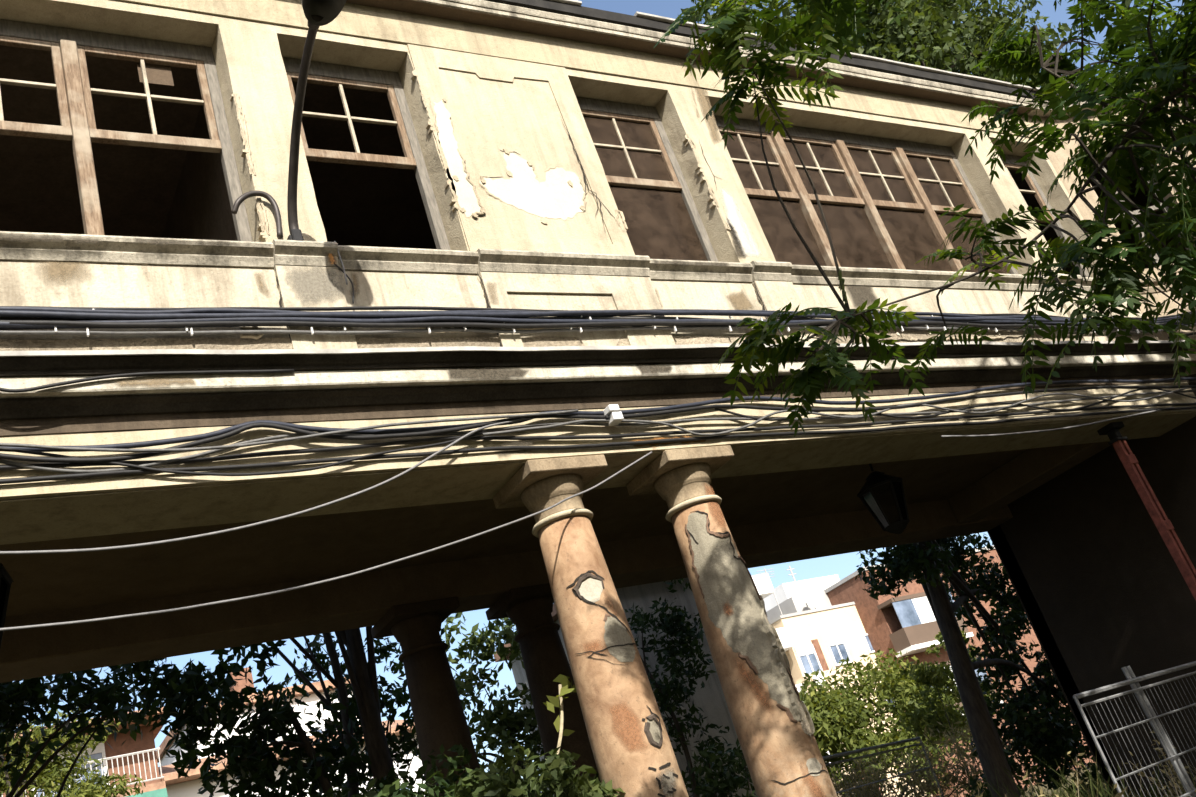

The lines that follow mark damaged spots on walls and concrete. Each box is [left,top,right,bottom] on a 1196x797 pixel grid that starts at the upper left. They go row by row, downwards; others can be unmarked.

peeling [410,69,587,224]
peeling [566,570,636,662]
peeling [685,510,815,741]
peeling [642,705,663,749]
peeling [648,762,678,797]
peeling [806,758,823,776]